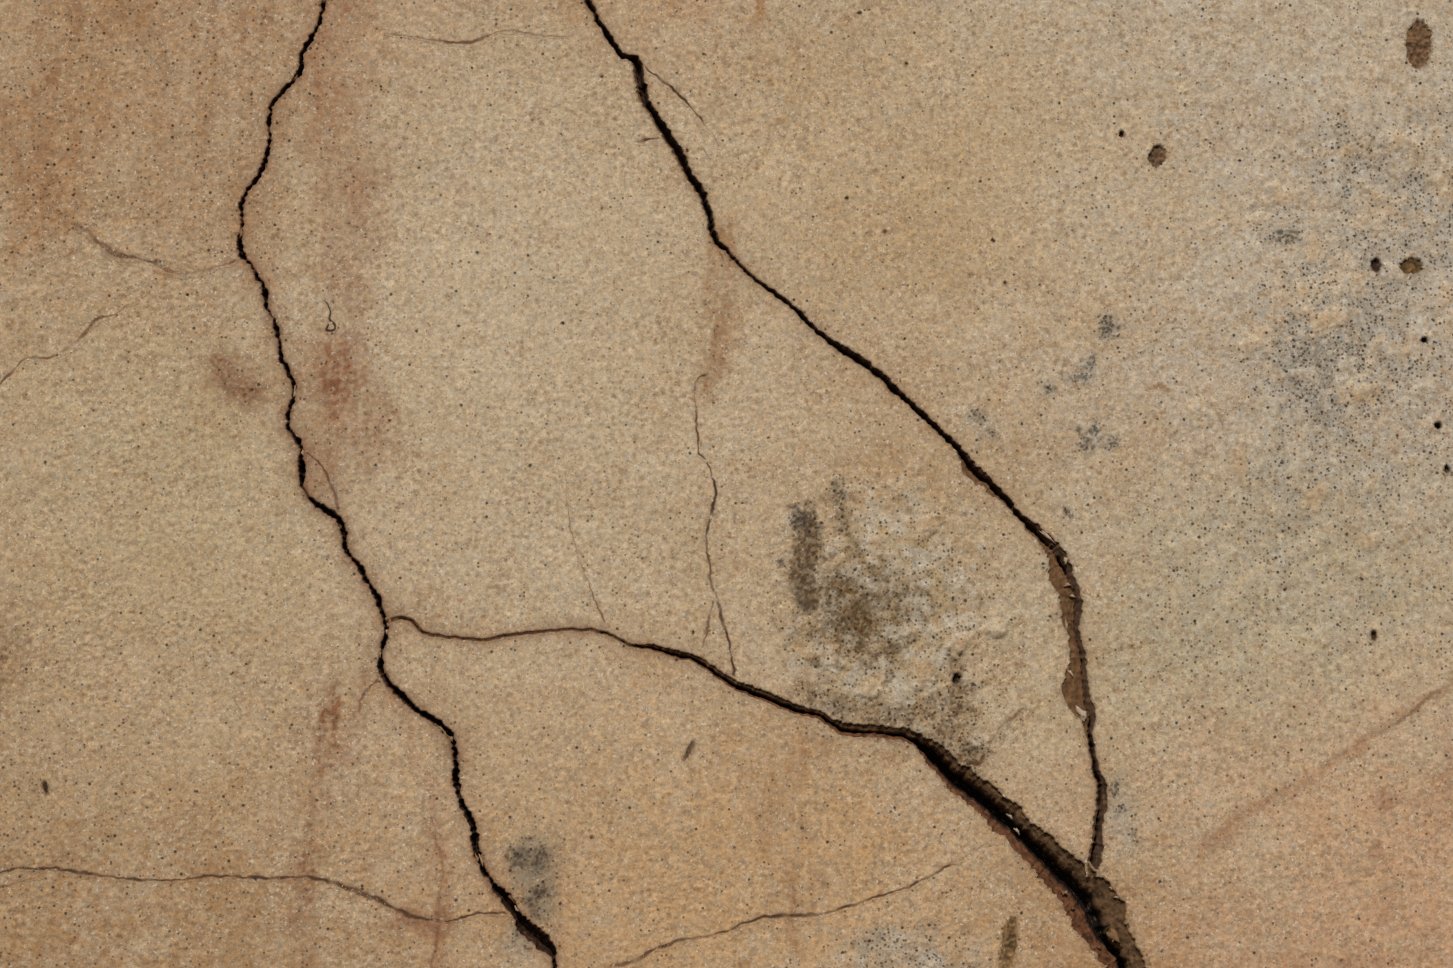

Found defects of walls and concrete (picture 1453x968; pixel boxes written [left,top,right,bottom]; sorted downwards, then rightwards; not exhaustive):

damp [0,571,106,878]
crack [0,0,1159,968]